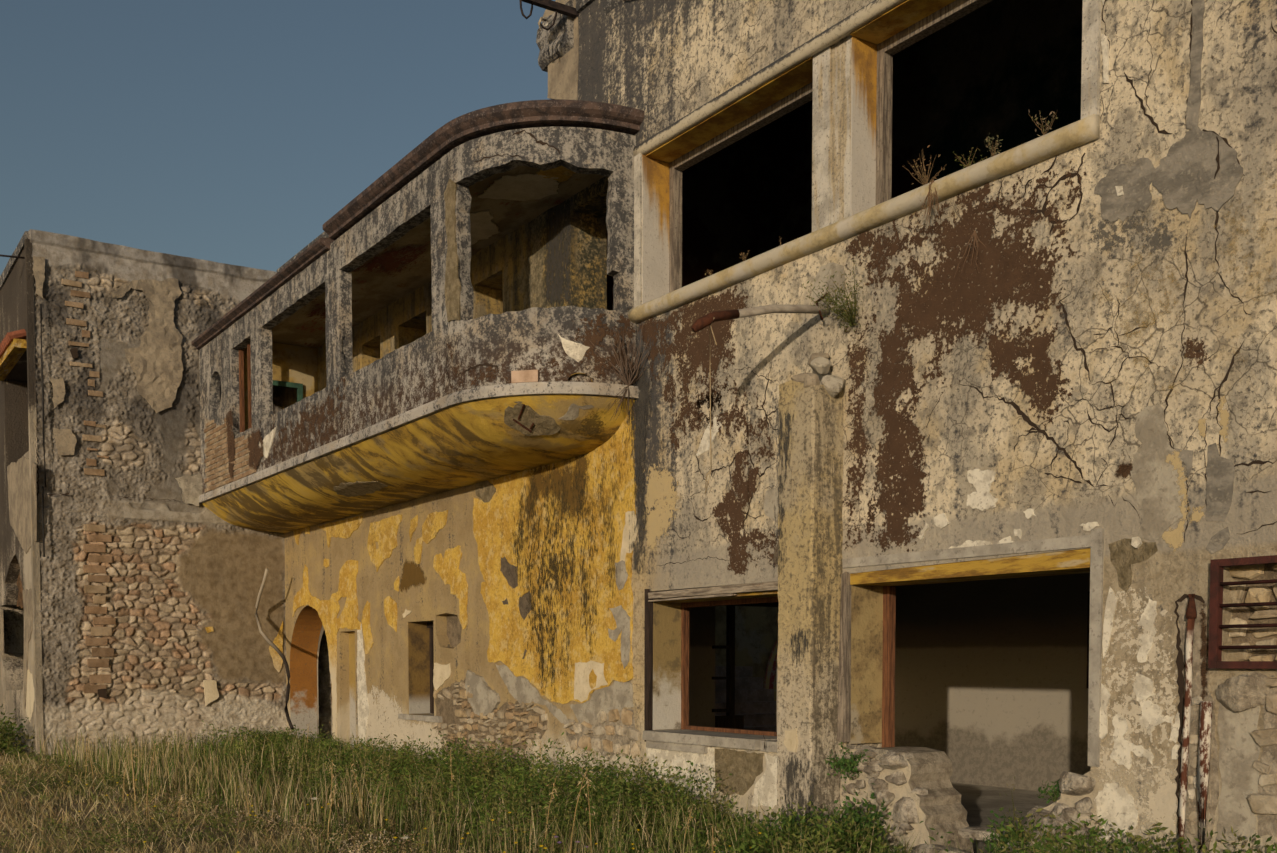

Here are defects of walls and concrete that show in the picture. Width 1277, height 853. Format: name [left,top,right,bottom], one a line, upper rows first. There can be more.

crack [961,153,1085,236]
crack [1213,137,1221,179]
flaking render [61,271,103,397]
crack [922,211,1276,543]
flaking render [83,524,116,699]
peeling [269,411,638,744]
damp [510,366,655,692]
peeling [1110,598,1180,770]
rust [1199,605,1209,699]